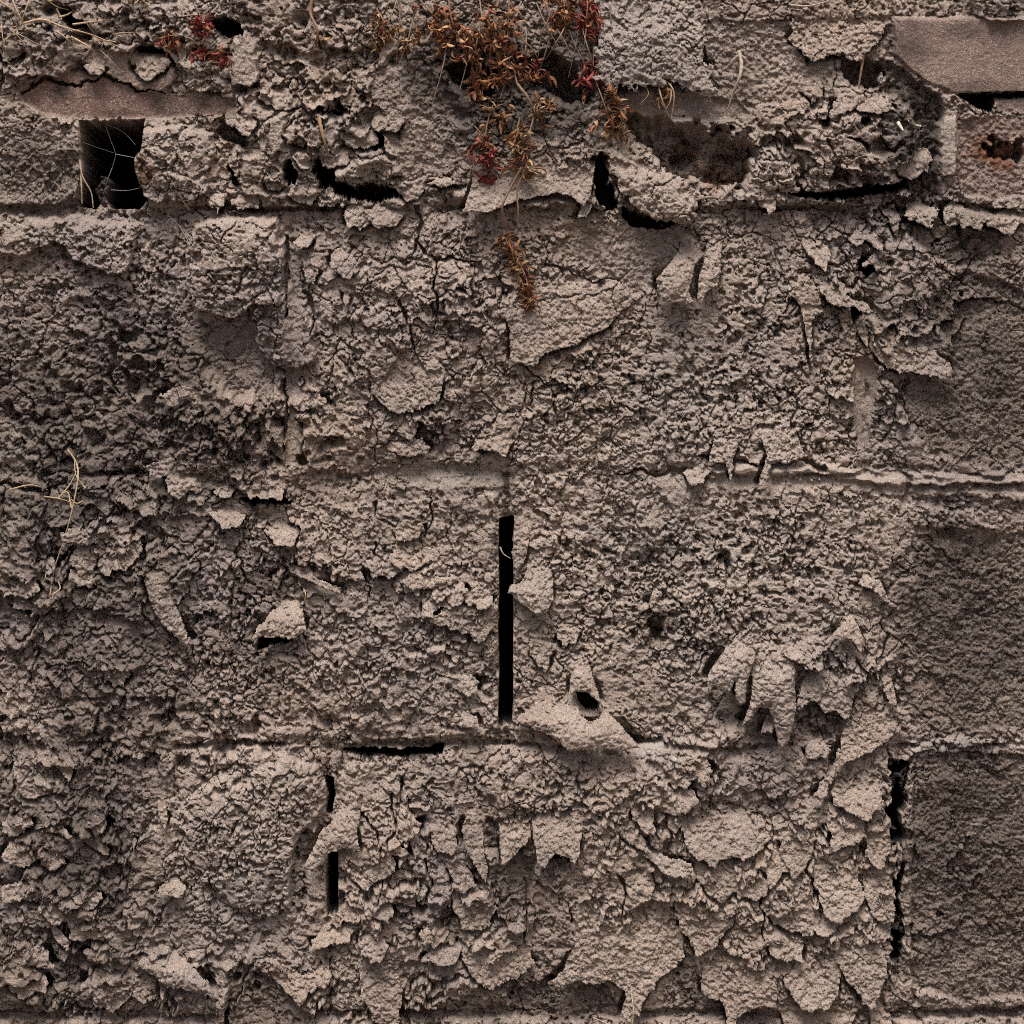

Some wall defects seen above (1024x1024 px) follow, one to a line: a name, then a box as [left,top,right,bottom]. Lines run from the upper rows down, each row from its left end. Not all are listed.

crack [281,235,316,337]
crack [397,205,477,346]
crack [545,263,623,285]
crack [279,377,290,452]
crack [517,363,606,407]
peeling [7,519,143,617]
peeling [252,594,306,641]
peeling [292,521,498,644]
peeling [508,515,640,752]
peeling [0,813,131,1013]
crack [360,793,434,930]
peeling [137,619,901,1024]